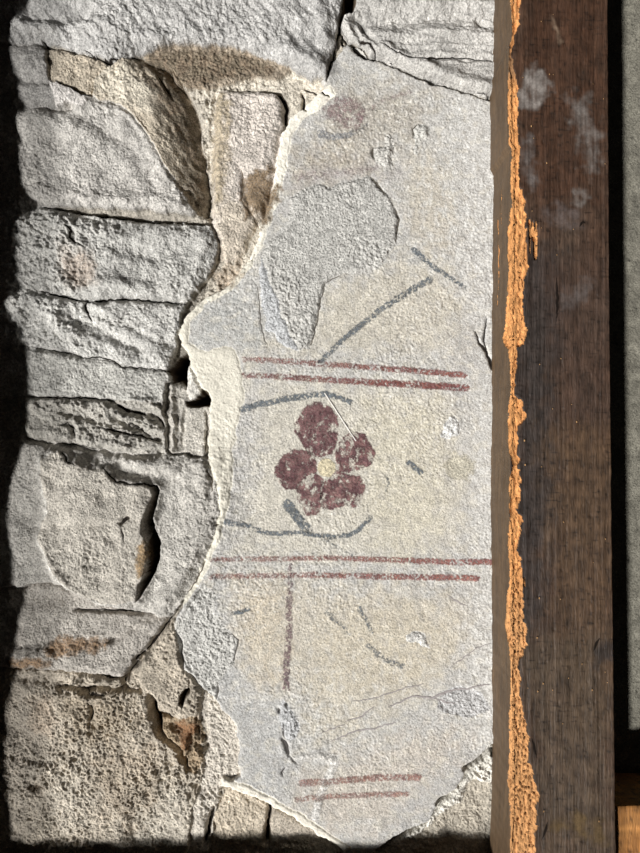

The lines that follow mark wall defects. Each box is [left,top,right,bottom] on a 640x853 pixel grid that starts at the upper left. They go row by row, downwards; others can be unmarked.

spalling [47,49,108,110]
leakage [148,47,273,201]
leakage [239,166,283,230]
spalling [37,450,160,606]
peeling [175,584,238,702]
spalling [156,708,207,775]